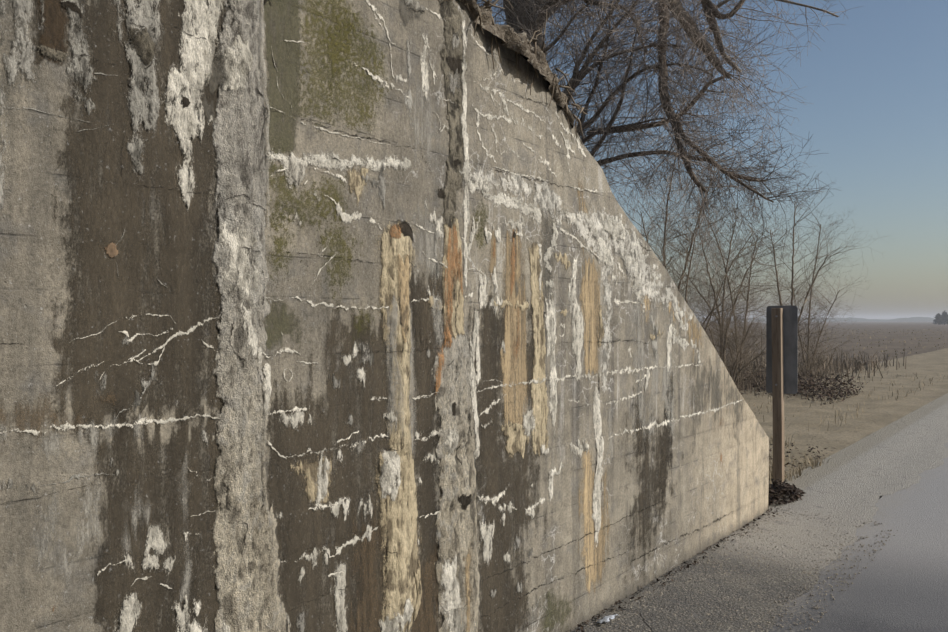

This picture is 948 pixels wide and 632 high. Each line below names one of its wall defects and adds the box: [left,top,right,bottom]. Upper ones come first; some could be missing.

leakage [404,34,431,156]
leakage [268,148,411,230]
crack [0,414,221,455]
leakage [0,0,230,632]
crack [56,313,217,386]
leakage [266,200,448,632]
corrosion [489,228,528,425]
crack [474,339,701,461]
corrosion [580,247,602,379]
leakage [459,161,743,632]
crack [607,400,742,440]
corrosion [578,439,610,594]